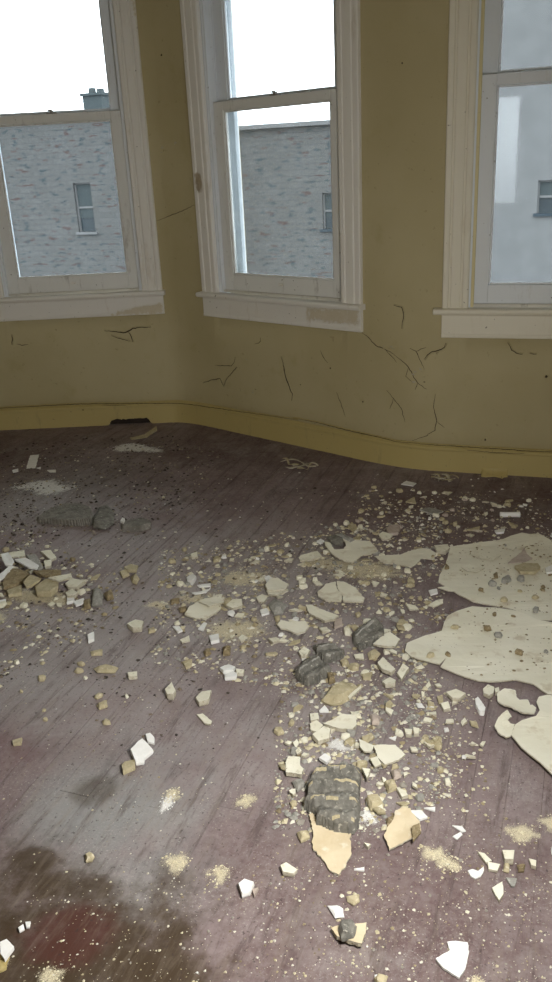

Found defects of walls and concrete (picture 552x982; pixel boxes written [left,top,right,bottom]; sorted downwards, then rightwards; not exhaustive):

crack [0,304,552,454]